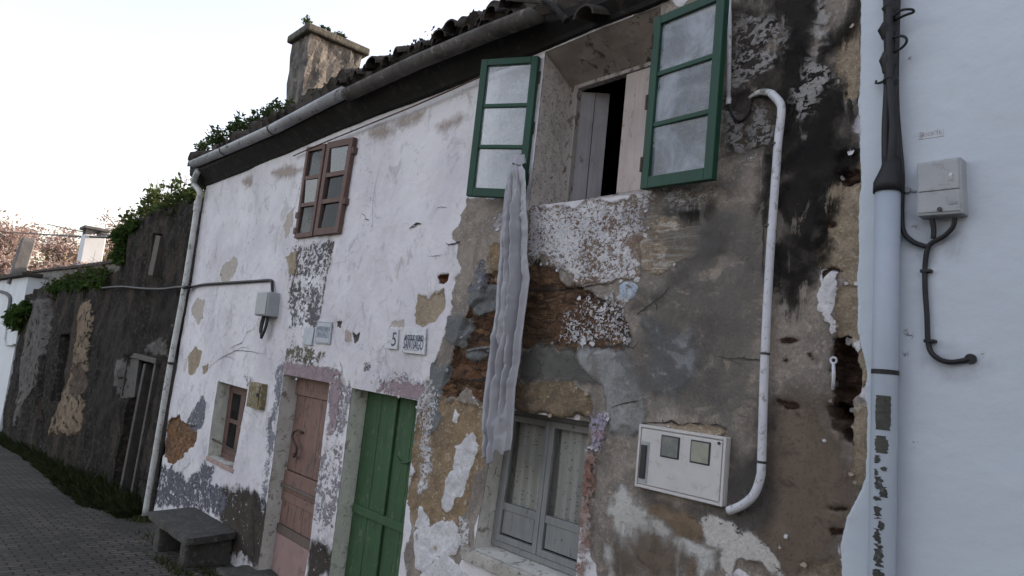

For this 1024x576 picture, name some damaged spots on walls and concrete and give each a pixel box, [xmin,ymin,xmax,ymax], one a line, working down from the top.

damp [721,0,861,310]
peeling [48,300,95,437]
spalling [157,396,215,504]
peeling [191,298,205,325]
peeling [220,256,238,282]
peeling [286,250,298,274]
peeling [261,361,351,532]
spalling [363,197,504,576]
flaking render [514,0,868,576]